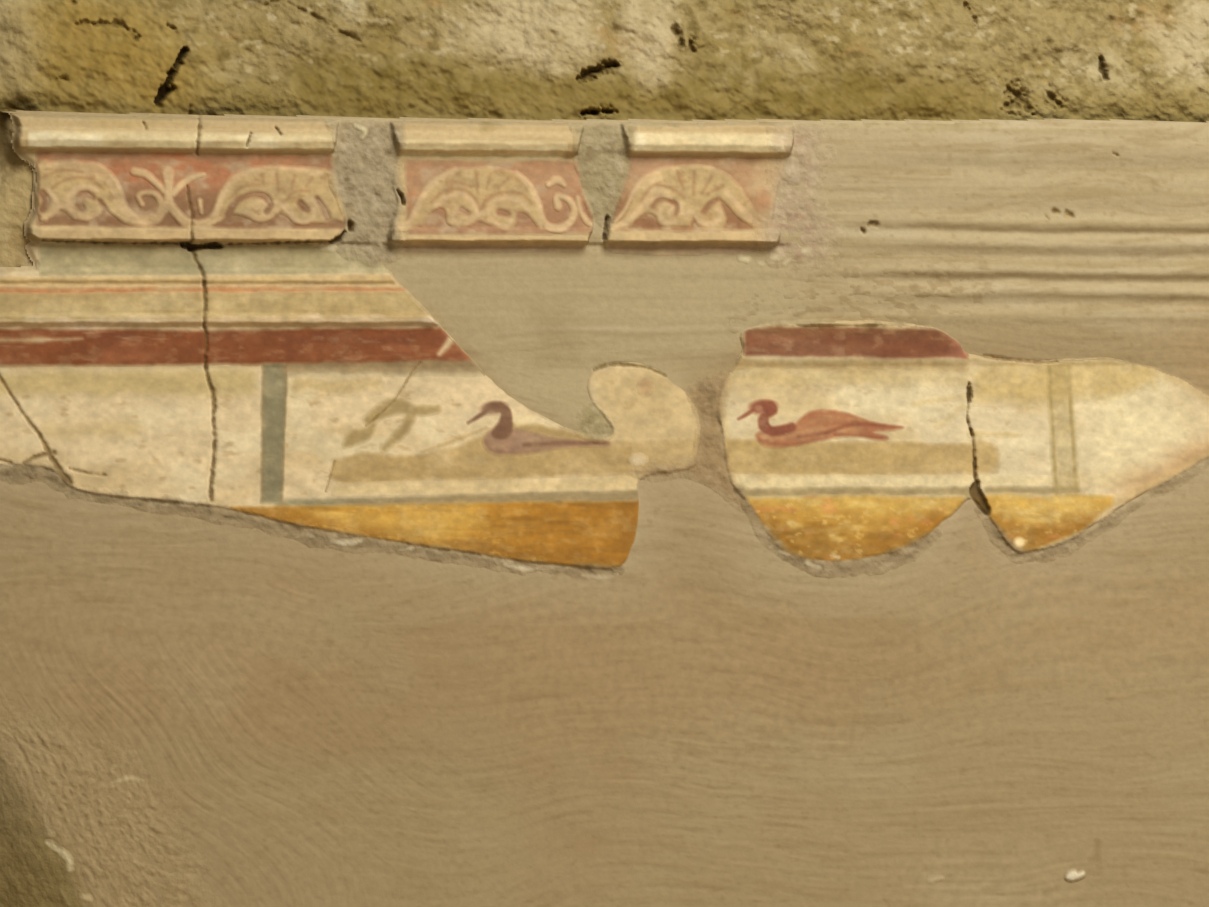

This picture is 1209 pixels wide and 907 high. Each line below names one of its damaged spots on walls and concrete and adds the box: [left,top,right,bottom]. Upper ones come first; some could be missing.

crack [187,103,202,157]
crack [224,238,334,246]
spalling [333,219,354,243]
crack [41,185,218,503]
crack [364,361,422,428]
crack [0,374,107,487]
crack [965,354,1059,516]
crack [324,459,337,493]